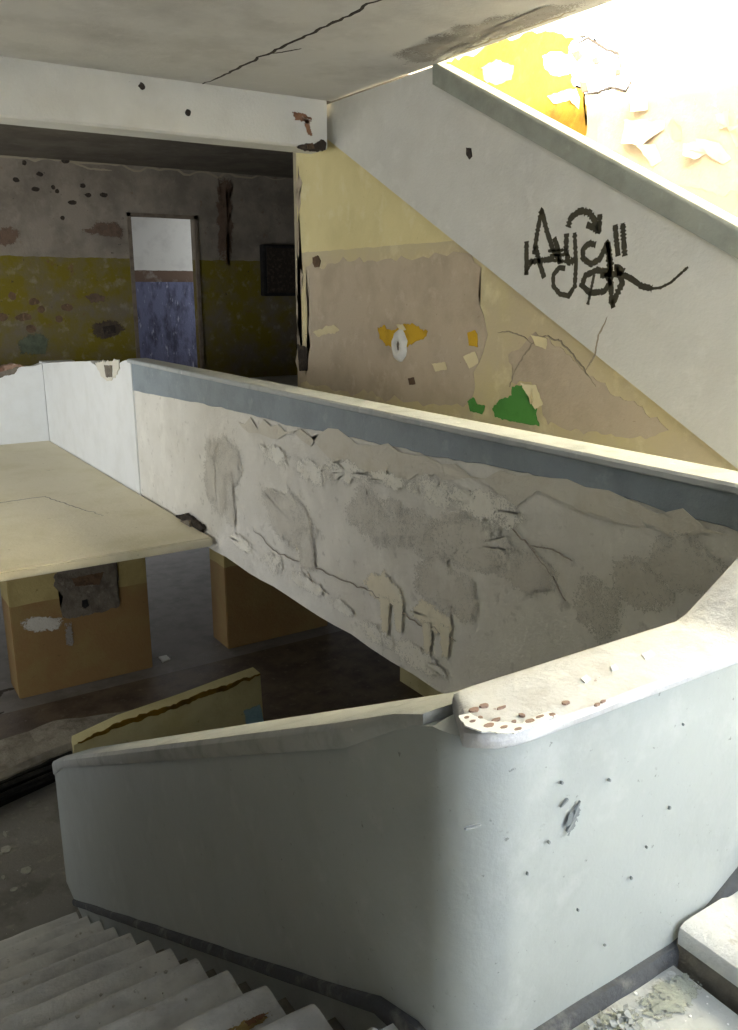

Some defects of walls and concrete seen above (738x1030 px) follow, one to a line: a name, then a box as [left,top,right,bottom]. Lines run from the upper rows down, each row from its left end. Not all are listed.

crack [202,0,382,84]
rust [292,111,312,136]
peeling [446,31,738,197]
rust [215,177,234,265]
spalling [0,298,49,378]
peeling [295,169,539,426]
spalling [239,417,730,540]
spalling [53,562,120,619]
crack [254,531,456,642]
crack [469,490,572,601]
spalling [459,700,570,735]